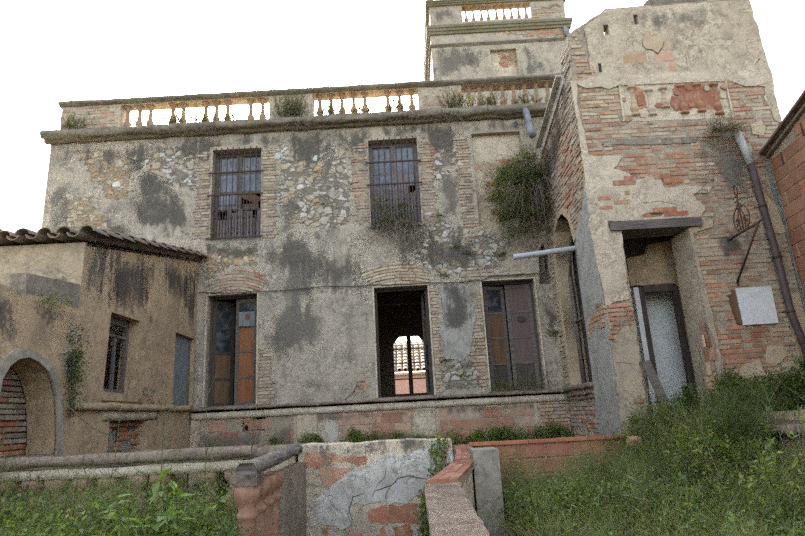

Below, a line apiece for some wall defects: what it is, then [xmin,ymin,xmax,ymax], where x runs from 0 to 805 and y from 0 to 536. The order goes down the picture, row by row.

flaking render [262,148,279,238]
flaking render [349,140,370,224]
flaking render [570,1,785,434]
water stain [88,245,154,312]
water stain [166,267,199,322]
water stain [207,236,361,358]
flaking render [361,262,535,392]
flaking render [303,451,367,489]
crack [348,446,428,526]
flaking render [368,502,420,536]